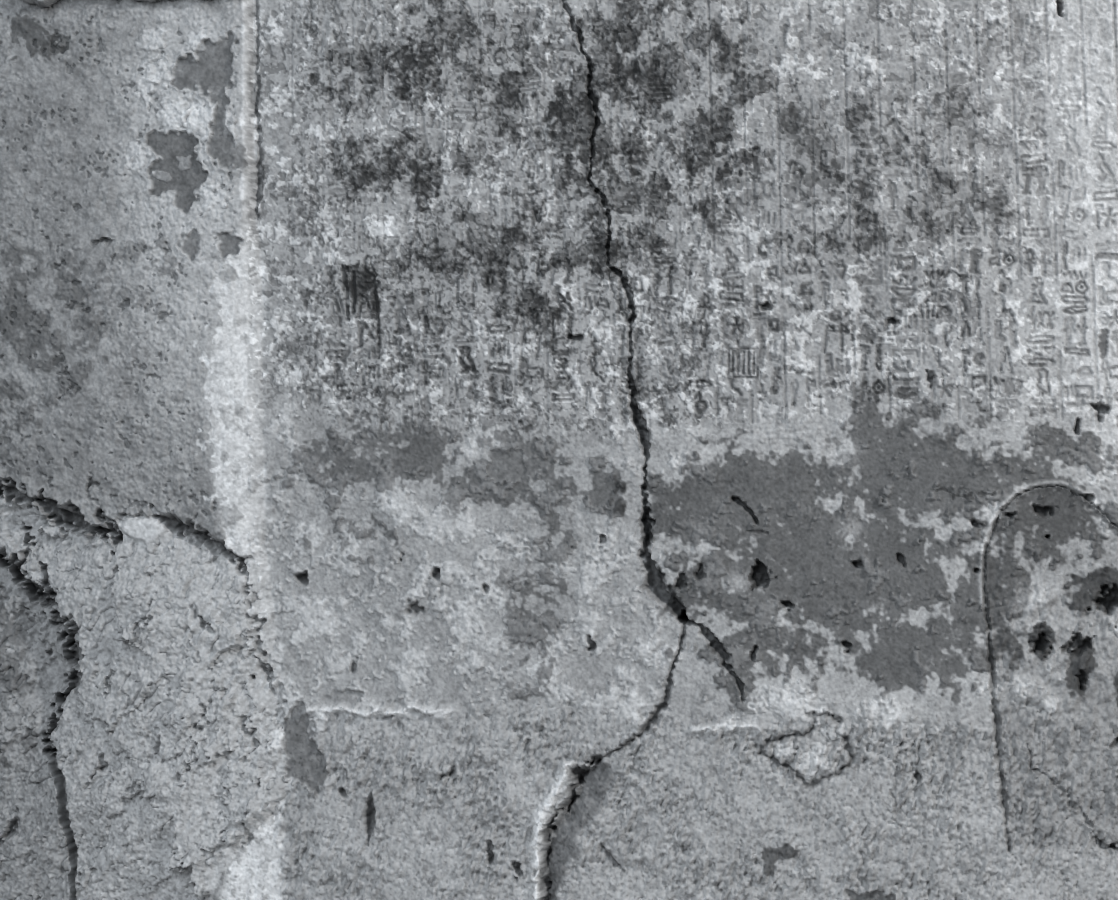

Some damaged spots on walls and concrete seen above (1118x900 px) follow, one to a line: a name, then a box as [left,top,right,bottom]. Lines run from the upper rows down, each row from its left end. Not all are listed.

crack [0,471,123,900]
crack [151,508,279,700]
crack [535,0,746,900]
leakage [266,352,1118,718]